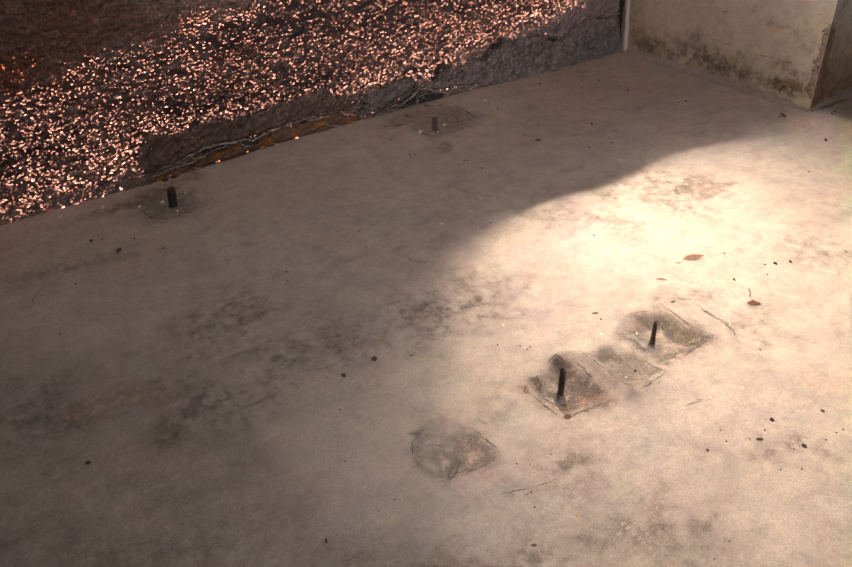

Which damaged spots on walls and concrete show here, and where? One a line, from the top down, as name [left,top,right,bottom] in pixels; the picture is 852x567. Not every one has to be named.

crack [0,75,483,220]
rust [137,88,359,199]
leakage [0,0,575,226]